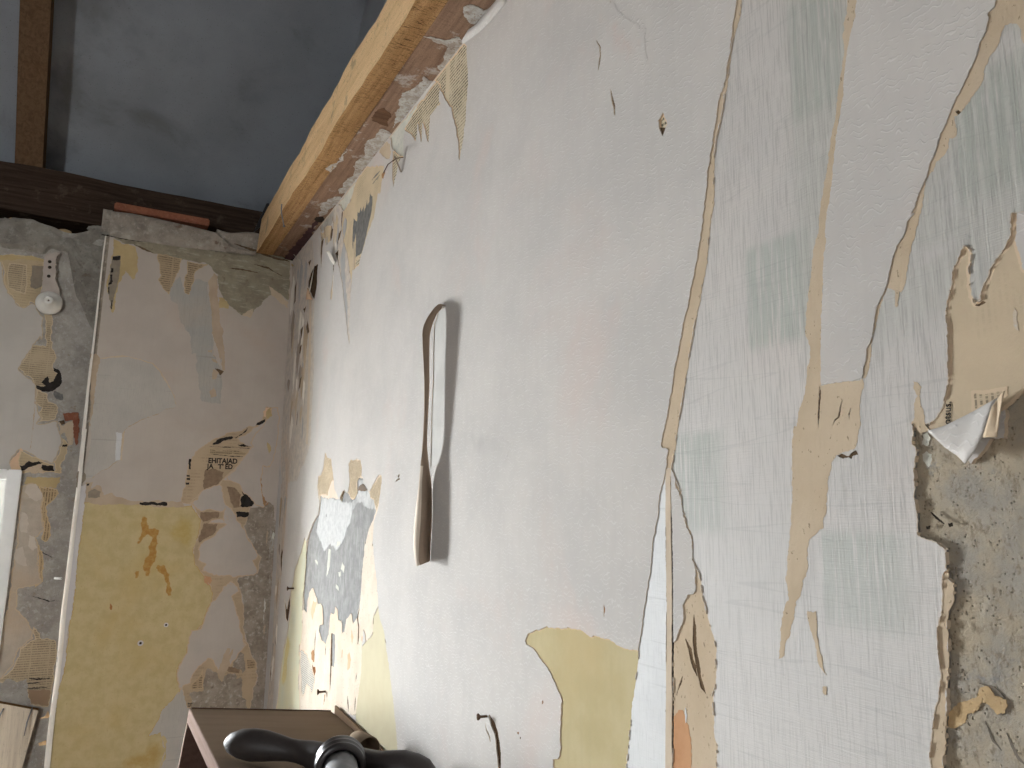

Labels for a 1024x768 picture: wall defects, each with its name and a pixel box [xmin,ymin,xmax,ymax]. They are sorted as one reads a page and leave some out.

peeling [380,106,417,182]
peeling [101,209,291,318]
peeling [321,184,355,341]
peeling [662,0,742,768]
peeling [779,0,1024,659]
peeling [0,412,80,679]
peeling [56,482,184,707]
peeling [188,502,276,709]
spalling [304,478,376,666]
spalling [911,381,1024,768]